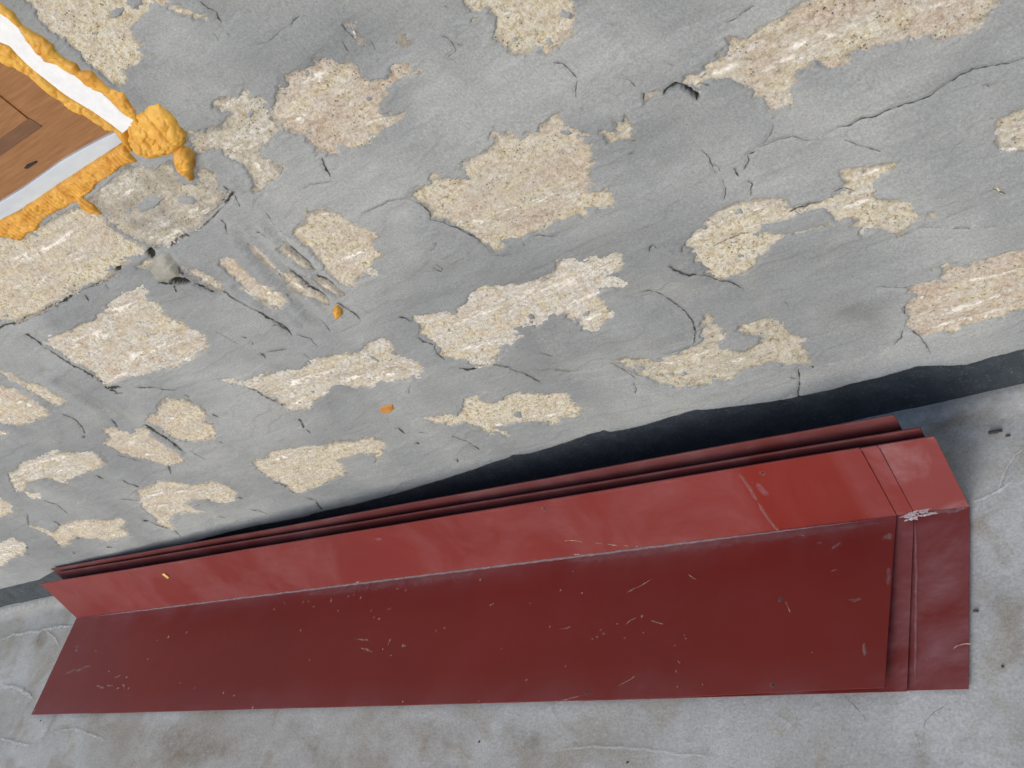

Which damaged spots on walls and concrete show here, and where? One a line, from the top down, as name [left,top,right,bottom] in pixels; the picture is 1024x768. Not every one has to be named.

spalling [682,0,1006,115]
crack [838,58,1023,152]
spalling [42,284,210,388]
spalling [0,58,423,325]
crack [146,186,329,359]
spalling [218,338,424,413]
spalling [410,252,628,368]
spalling [413,113,637,252]
crack [645,290,696,344]
spalling [685,161,940,281]
spalling [8,397,218,499]
spalling [252,436,386,494]